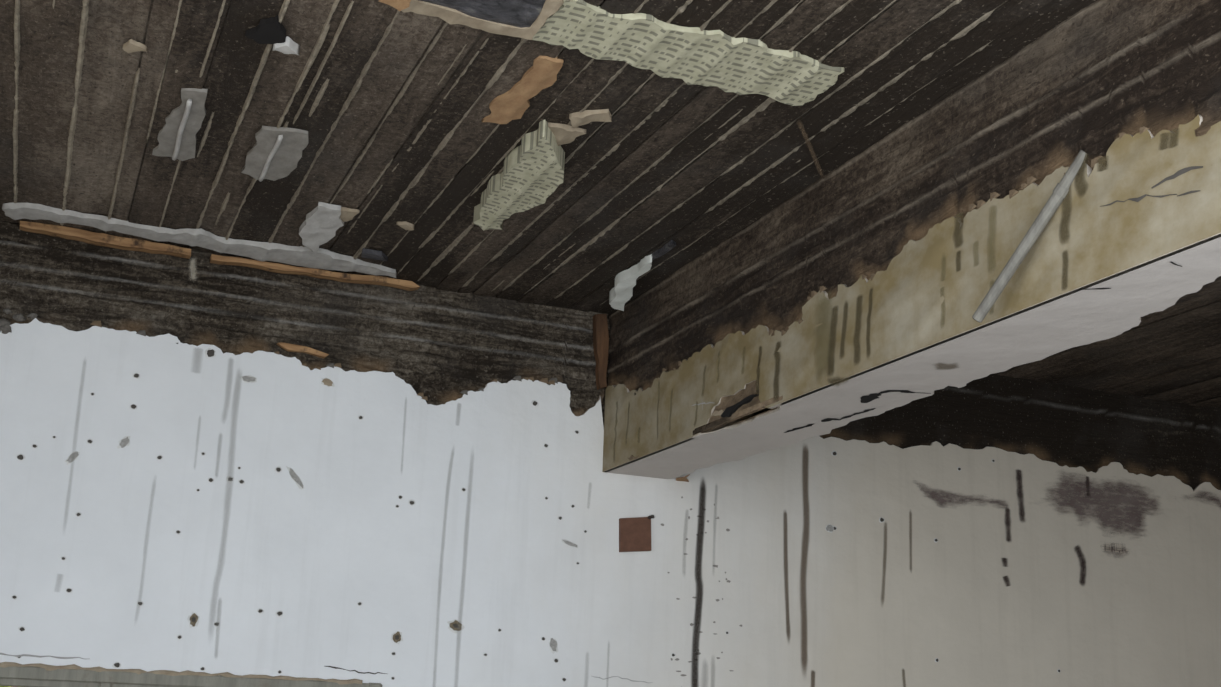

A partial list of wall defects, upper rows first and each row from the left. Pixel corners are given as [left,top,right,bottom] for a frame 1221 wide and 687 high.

flaking render [0,0,1221,416]
flaking render [693,381,783,435]
flaking render [820,374,1221,490]
damp [921,470,1025,541]
damp [1051,477,1157,532]
damp [671,482,731,687]
damp [1075,546,1086,585]
crack [0,652,84,660]